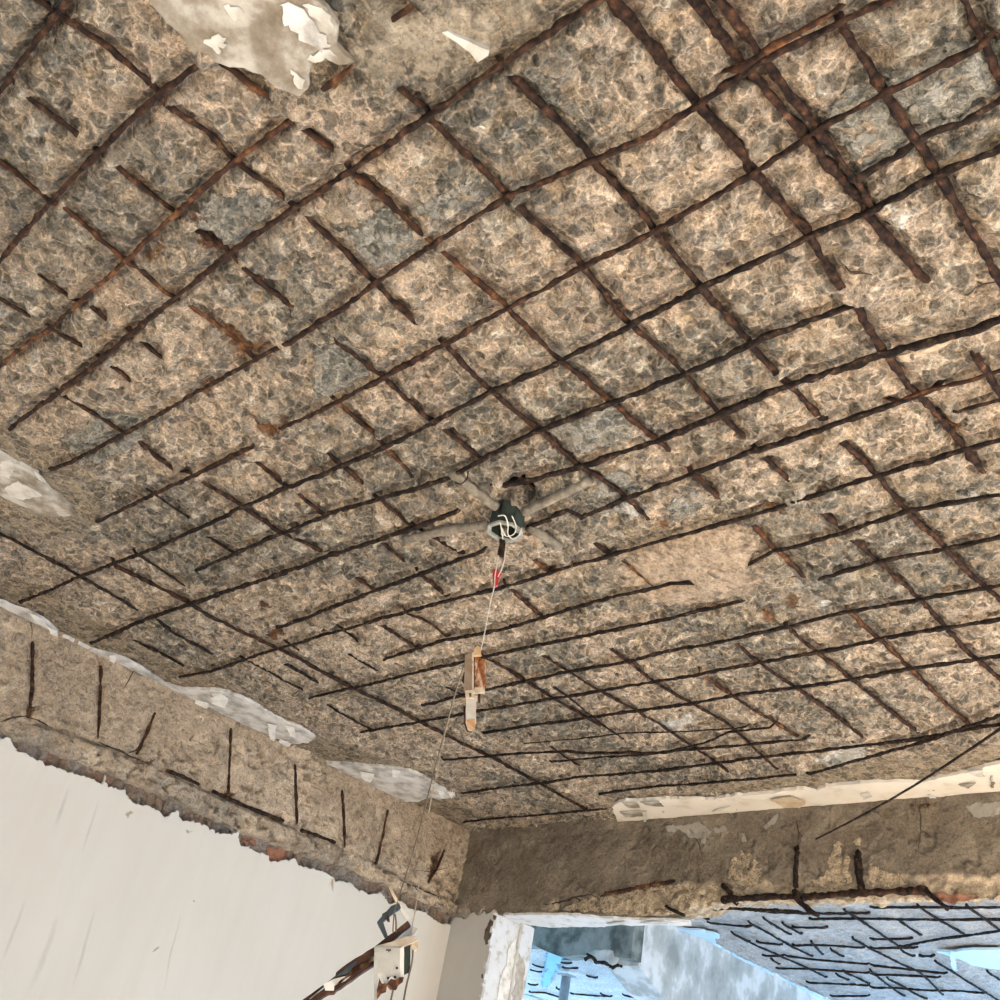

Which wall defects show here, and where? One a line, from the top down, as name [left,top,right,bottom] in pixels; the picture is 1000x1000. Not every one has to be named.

peeling [149,0,356,97]
peeling [442,28,490,63]
spalling [828,30,1000,168]
corrosion [192,210,222,249]
spalling [195,187,281,243]
corrosion [223,323,270,358]
corrosion [245,409,289,439]
peeling [0,450,75,519]
corrosion [264,628,284,640]
peeling [0,599,316,747]
peeling [612,760,1000,822]
peeling [936,947,1000,971]